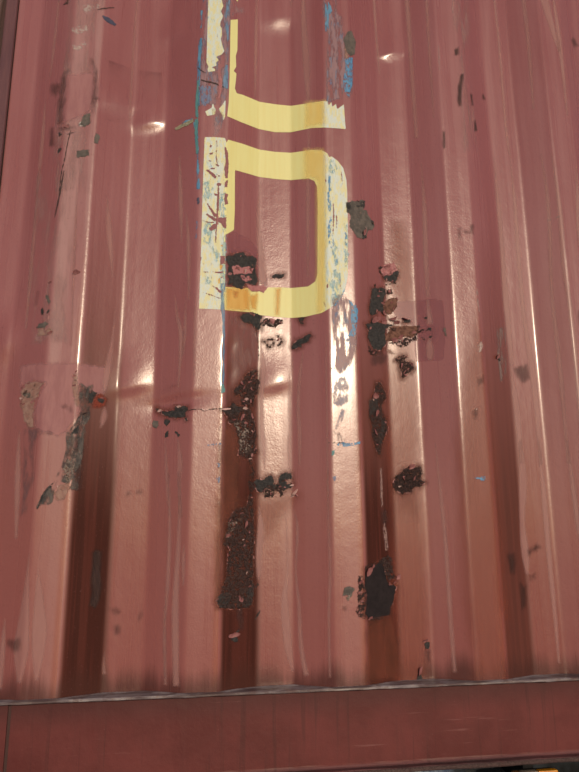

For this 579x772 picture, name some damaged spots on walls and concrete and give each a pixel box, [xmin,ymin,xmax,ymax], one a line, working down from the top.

rust [346,199,374,239]
rust [226,252,311,349]
rust [369,263,399,315]
rust [395,355,415,378]
rust [368,382,389,455]
rust [216,369,298,619]
rust [392,464,425,495]
rust [342,555,401,681]